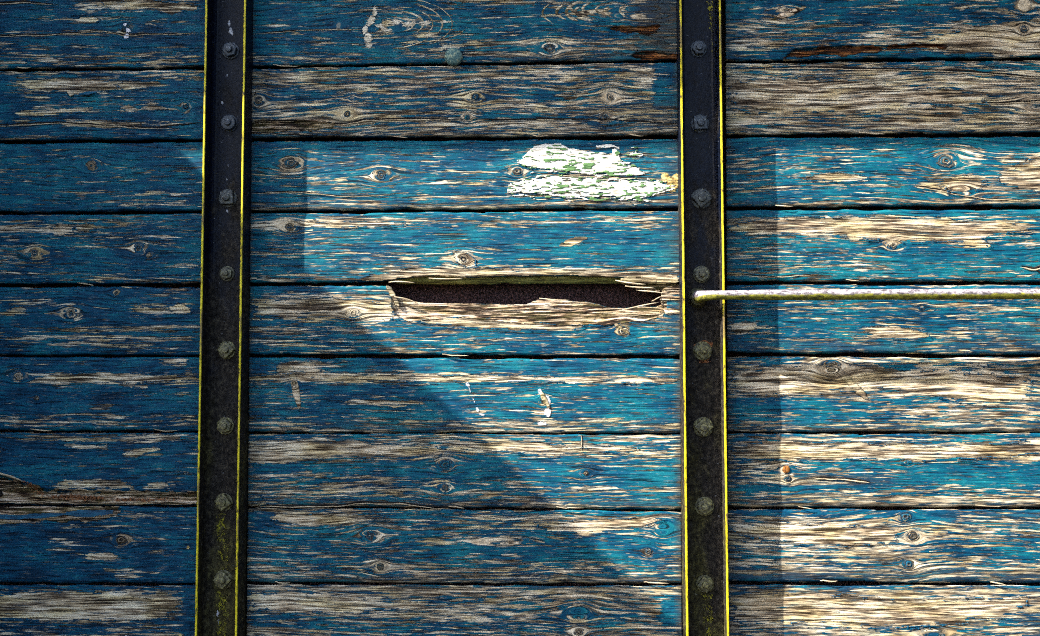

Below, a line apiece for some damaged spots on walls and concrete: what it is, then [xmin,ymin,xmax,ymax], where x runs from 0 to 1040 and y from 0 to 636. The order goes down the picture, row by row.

peeling [55,478,170,489]
peeling [0,510,113,519]